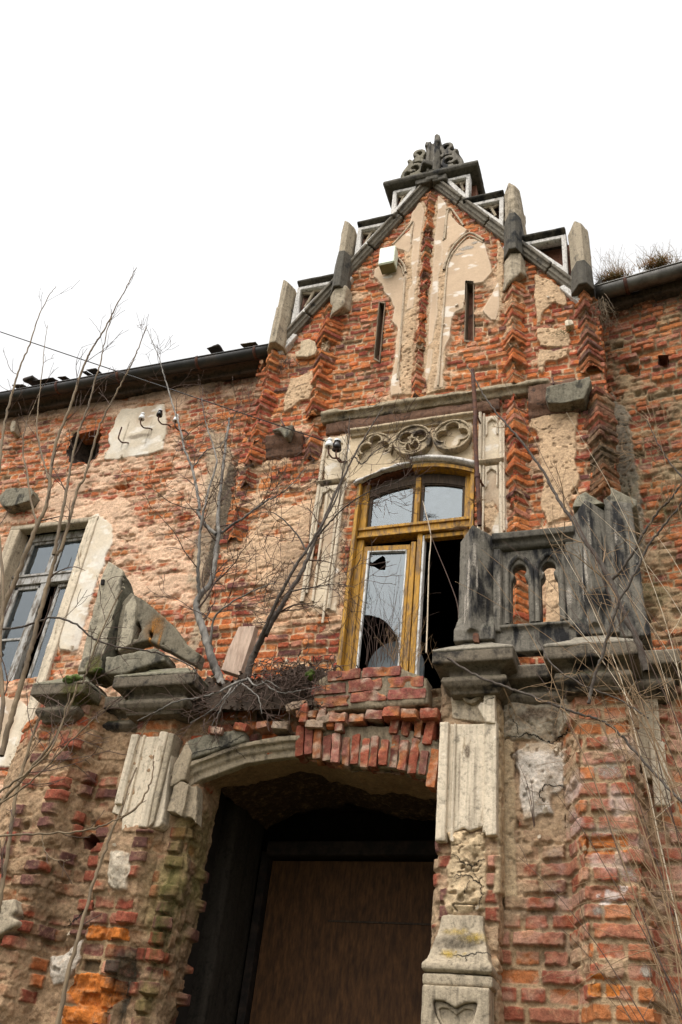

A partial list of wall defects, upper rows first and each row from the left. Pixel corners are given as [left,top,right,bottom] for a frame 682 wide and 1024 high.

spalling [443,211,502,392]
spalling [543,296,574,331]
spalling [58,513,211,654]
damp [464,544,500,625]
damp [565,518,629,621]
flaking render [0,696,36,770]
spalling [84,834,101,850]
crack [450,854,485,904]
spalling [86,924,131,942]
spalling [61,972,132,1024]